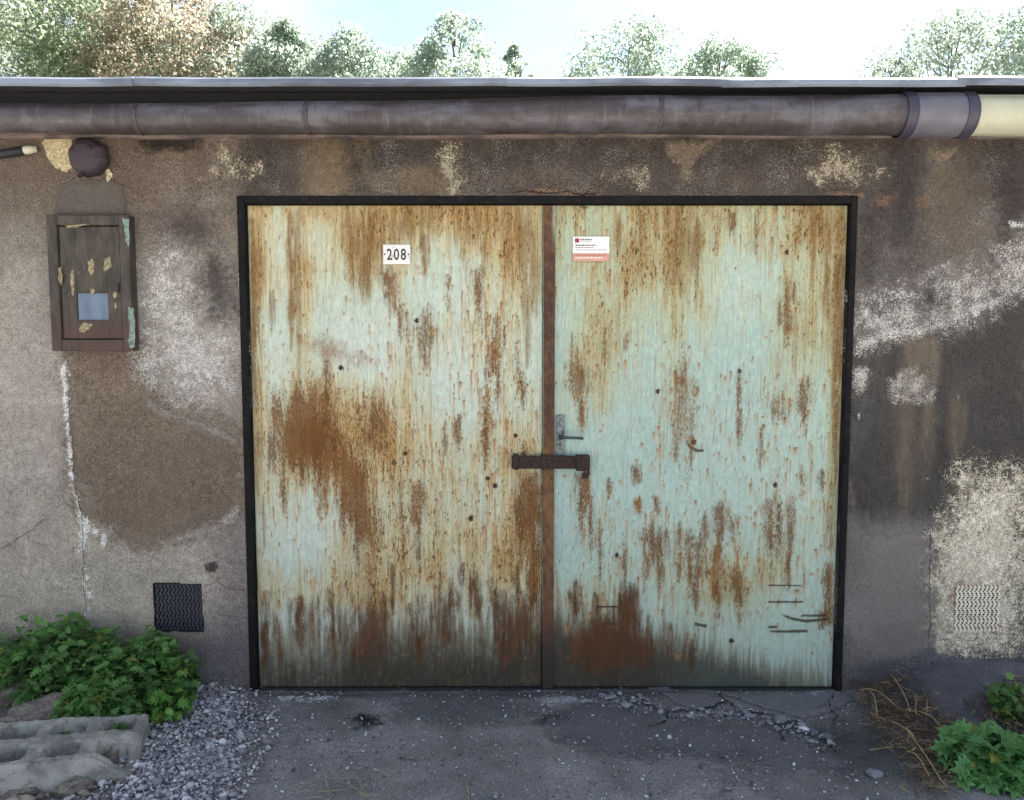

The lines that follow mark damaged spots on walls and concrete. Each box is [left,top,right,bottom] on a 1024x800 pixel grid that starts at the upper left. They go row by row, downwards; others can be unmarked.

leakage [62,234,254,551]
rust [349,213,435,365]
rust [472,269,528,488]
leakage [803,140,920,244]
leakage [837,156,1024,527]
crack [68,376,87,614]
rust [259,354,394,667]
rust [409,471,543,669]
rust [574,473,602,578]
rust [564,534,654,675]
rust [633,496,748,628]
rust [764,465,806,591]